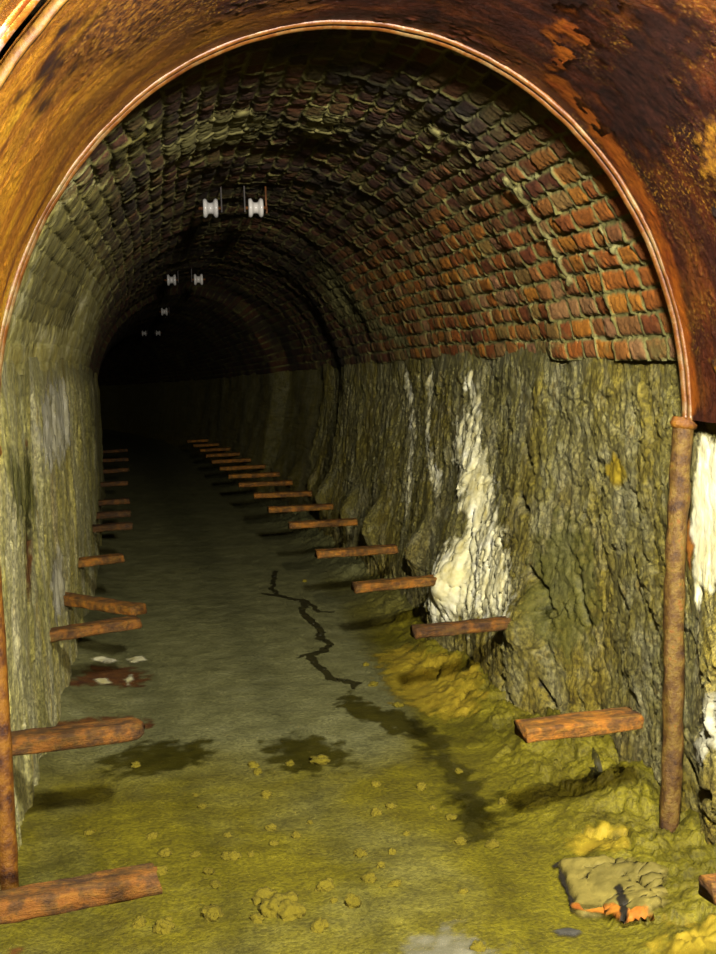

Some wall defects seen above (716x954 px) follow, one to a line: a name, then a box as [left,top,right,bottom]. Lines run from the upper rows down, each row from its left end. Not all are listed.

rust [542,9,699,415]
rust [686,519,694,569]
crack [262,570,363,689]